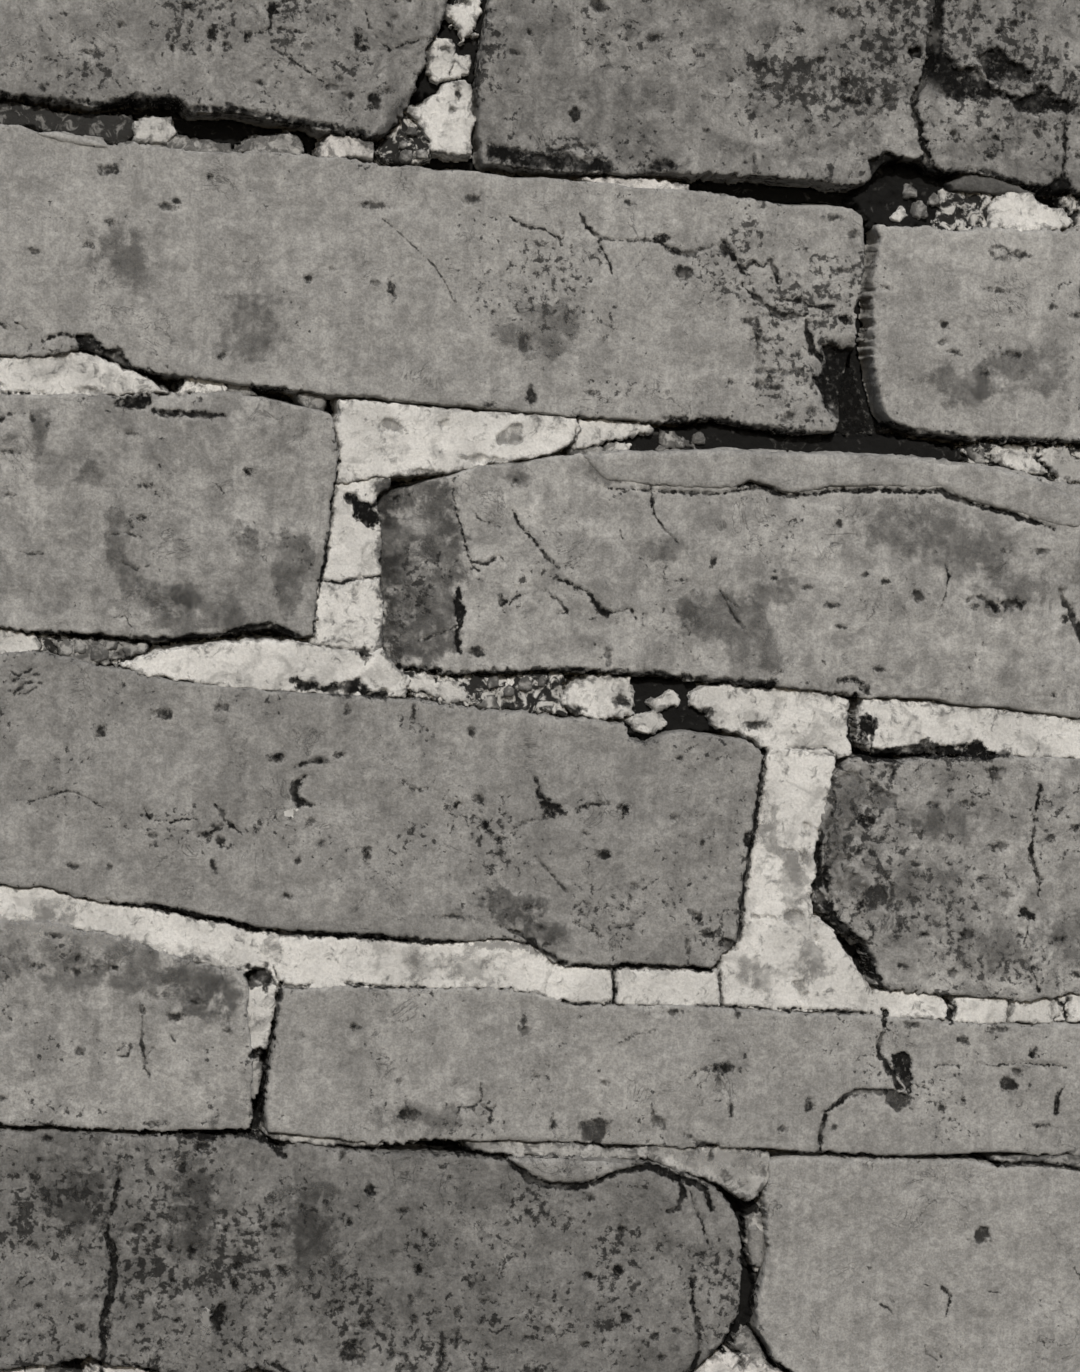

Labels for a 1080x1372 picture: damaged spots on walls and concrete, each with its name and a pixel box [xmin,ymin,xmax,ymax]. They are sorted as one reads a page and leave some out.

crack [509,212,835,362]
crack [418,477,637,655]
crack [608,482,1056,543]
crack [109,901,463,1159]
crack [500,692,1080,1171]
crack [98,1168,158,1372]
crack [264,1360,289,1372]
crack [426,1087,792,1372]